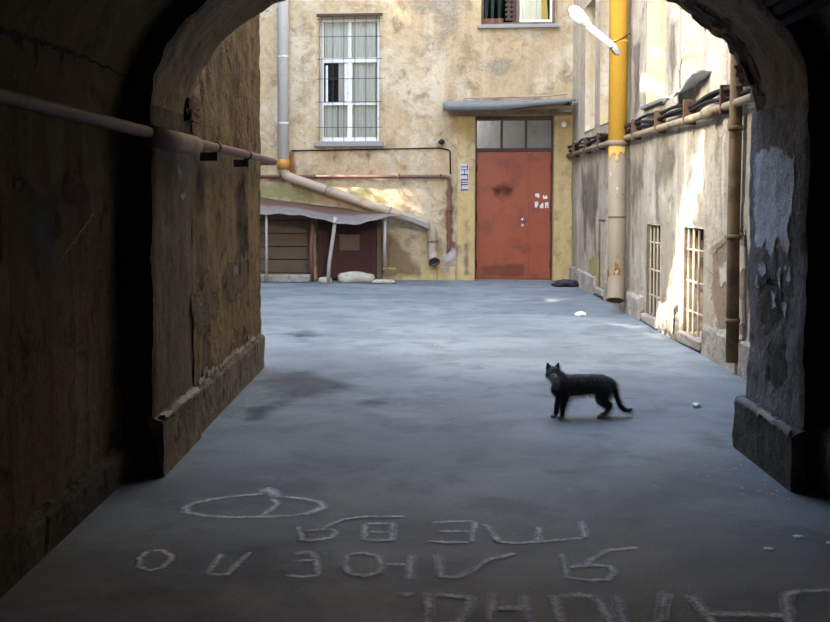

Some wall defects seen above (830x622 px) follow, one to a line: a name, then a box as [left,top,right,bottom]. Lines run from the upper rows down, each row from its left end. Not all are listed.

crack [0,26,128,79]
spalling [705,231,727,330]
peeling [739,145,795,341]
spalling [160,332,262,419]